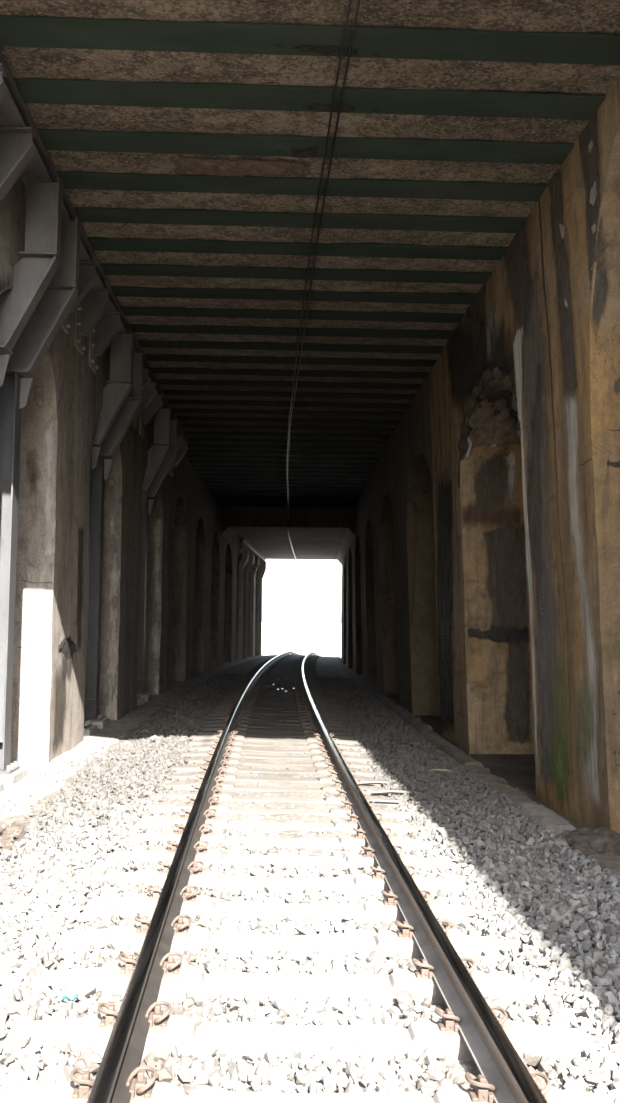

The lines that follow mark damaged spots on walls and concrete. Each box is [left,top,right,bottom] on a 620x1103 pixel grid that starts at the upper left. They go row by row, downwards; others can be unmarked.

spalling [458,362,521,487]
damp [446,217,560,774]